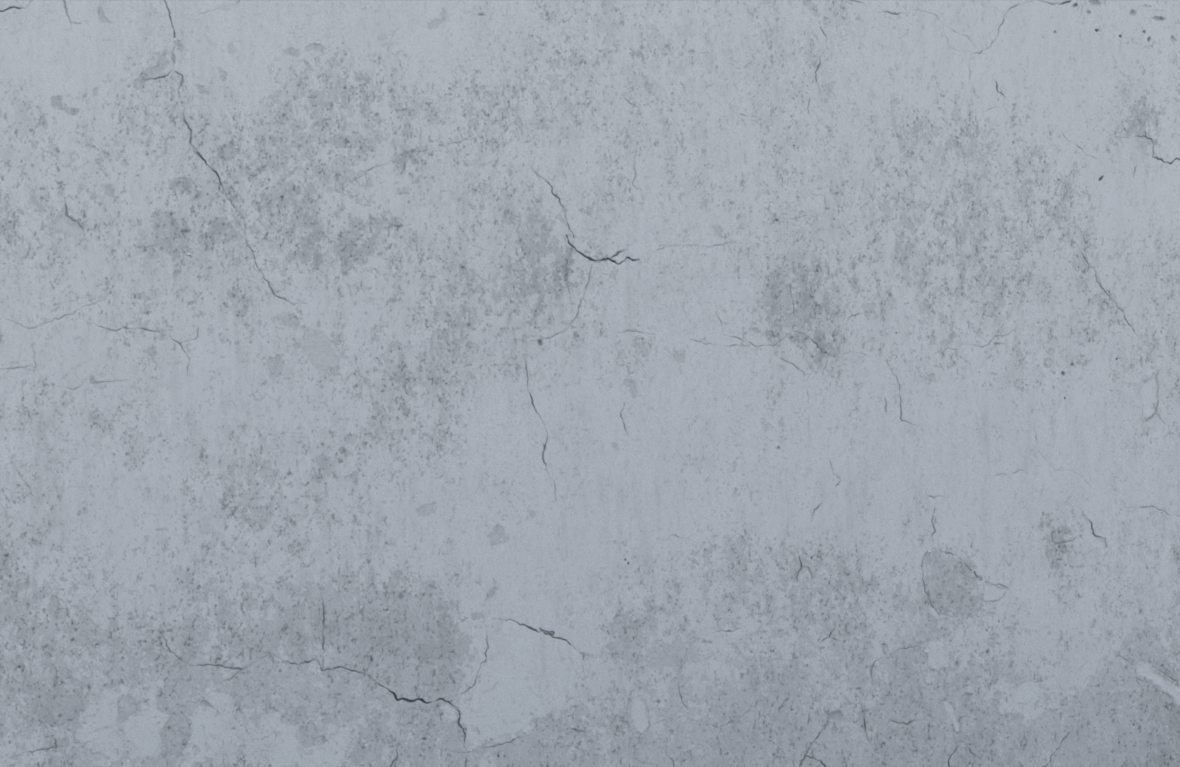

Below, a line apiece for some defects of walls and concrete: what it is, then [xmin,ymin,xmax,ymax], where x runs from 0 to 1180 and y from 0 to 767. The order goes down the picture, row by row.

crack [0,0,33,13]
crack [143,0,308,306]
crack [807,0,1083,144]
crack [1062,130,1180,181]
crack [0,299,200,392]
crack [523,165,743,502]
crack [689,278,920,583]
crack [1079,247,1167,426]
crack [1049,507,1108,548]
crack [154,574,587,767]
crack [615,494,1016,767]
flaking render [1132,660,1180,707]